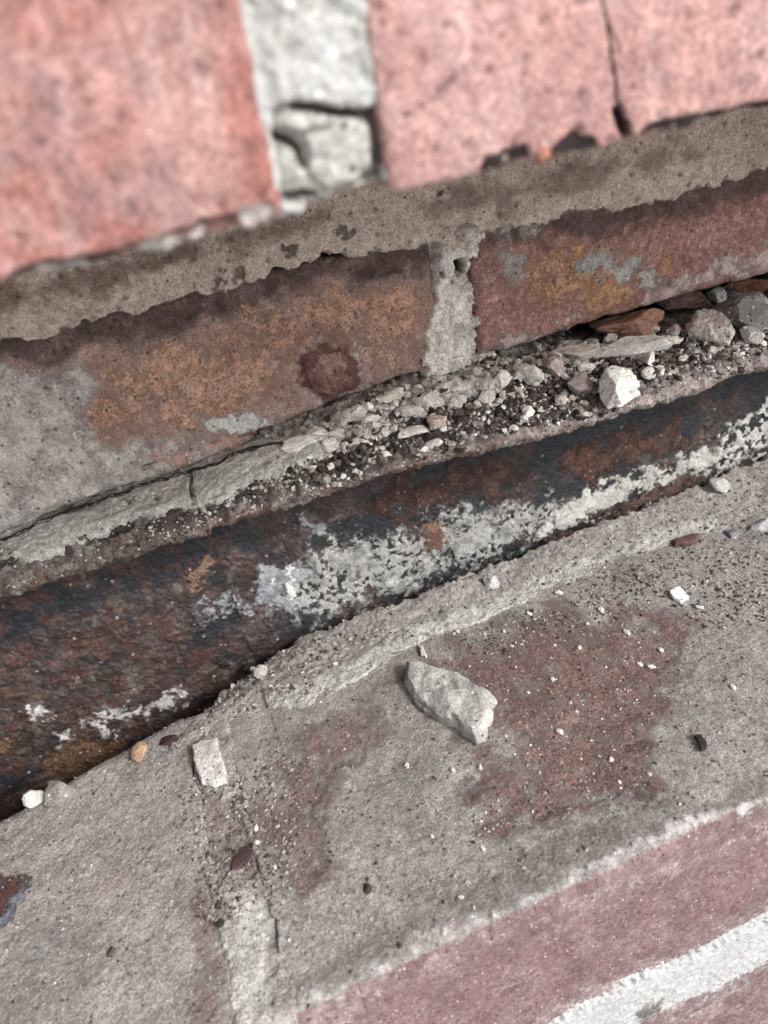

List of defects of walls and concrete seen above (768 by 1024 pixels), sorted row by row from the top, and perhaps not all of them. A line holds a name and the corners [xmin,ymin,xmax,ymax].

crack [0,392,356,541]
corrosion [558,416,691,488]
corrosion [364,454,533,554]
peeling [285,397,768,631]
corrosion [544,525,573,543]
corrosion [598,473,707,520]
corrosion [183,554,216,597]
corrosion [41,736,129,786]
corrosion [159,734,178,745]